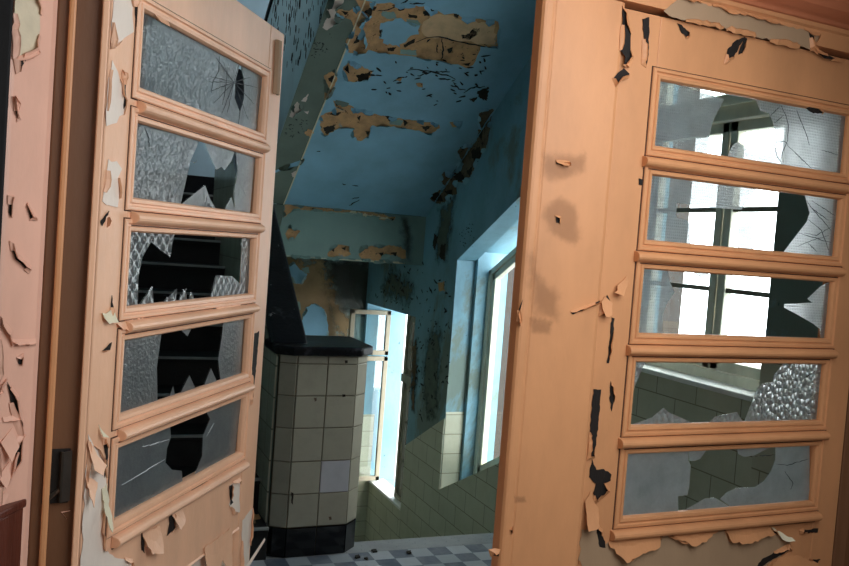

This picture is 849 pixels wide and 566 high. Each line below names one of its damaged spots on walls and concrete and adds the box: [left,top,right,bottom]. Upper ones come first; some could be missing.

peeling [304,0,501,141]
peeling [289,244,412,302]
peeling [0,316,14,396]
peeling [297,301,329,336]
peeling [0,415,24,506]